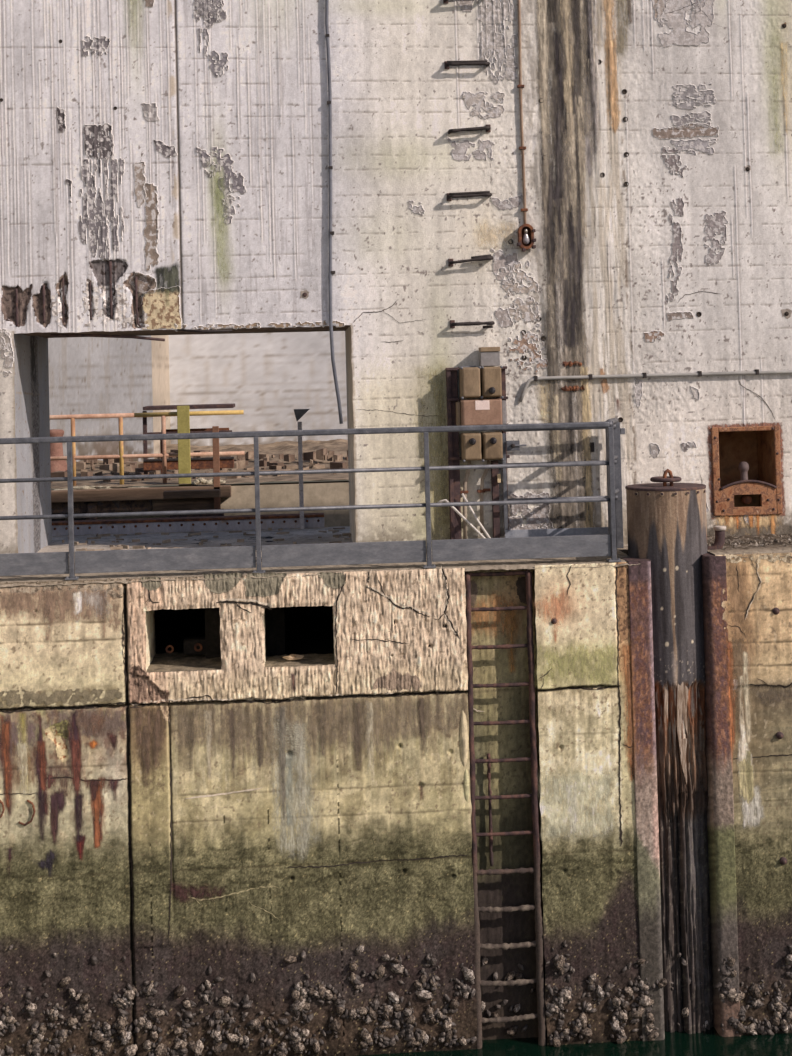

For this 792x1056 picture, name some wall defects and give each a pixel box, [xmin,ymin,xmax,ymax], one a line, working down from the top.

peeling [652,83,719,178]
spalling [0,272,69,378]
peeling [65,123,345,332]
leakage [537,0,600,529]
rust [708,422,785,535]
leakage [708,522,792,536]
crack [538,562,633,845]
rust [623,645,634,780]
crack [748,679,792,688]
rust [0,712,118,876]
crack [0,566,468,1054]
leakage [191,886,280,904]